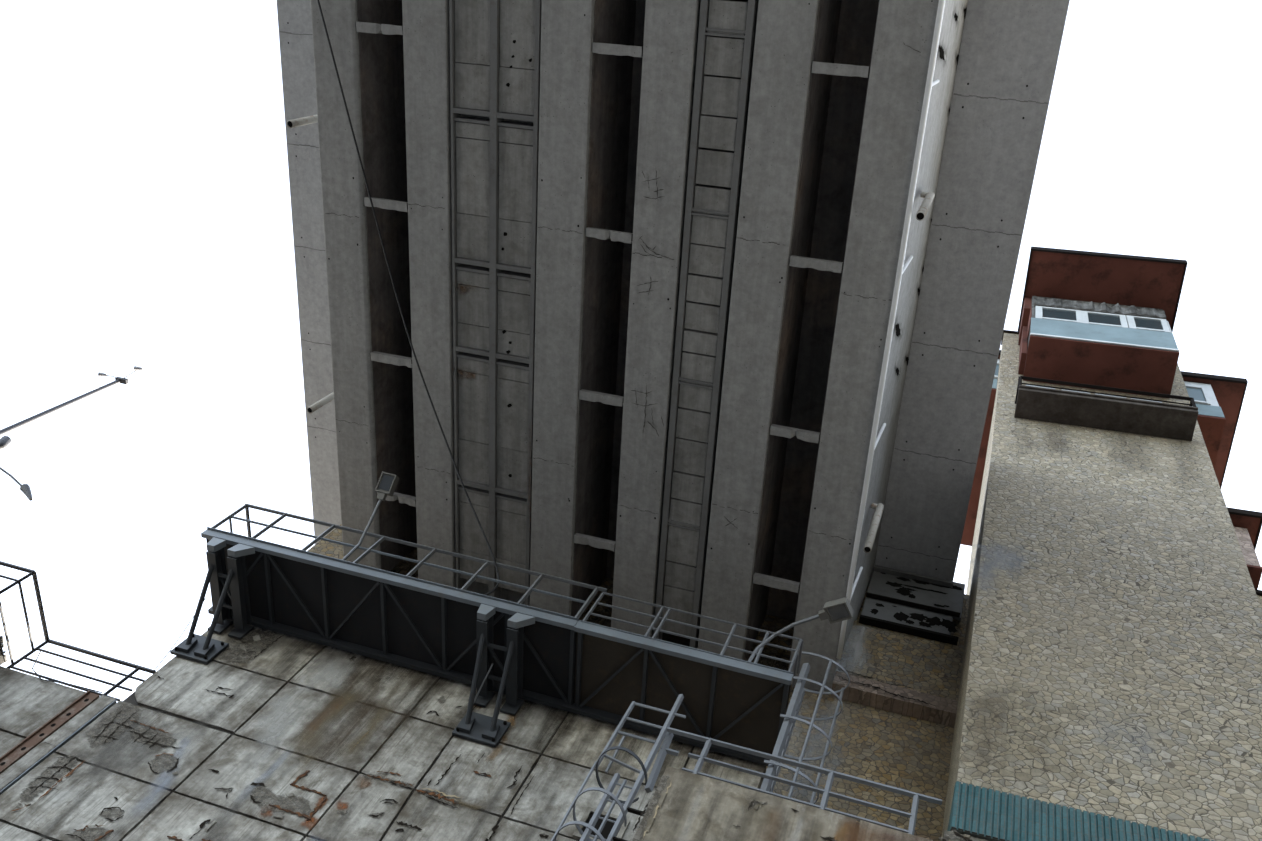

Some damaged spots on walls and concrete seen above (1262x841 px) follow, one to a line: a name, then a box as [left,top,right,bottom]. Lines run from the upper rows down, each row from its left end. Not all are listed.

peeling [870,572,962,633]
spalling [12,704,180,811]
spalling [250,770,328,828]
spalling [631,775,671,841]